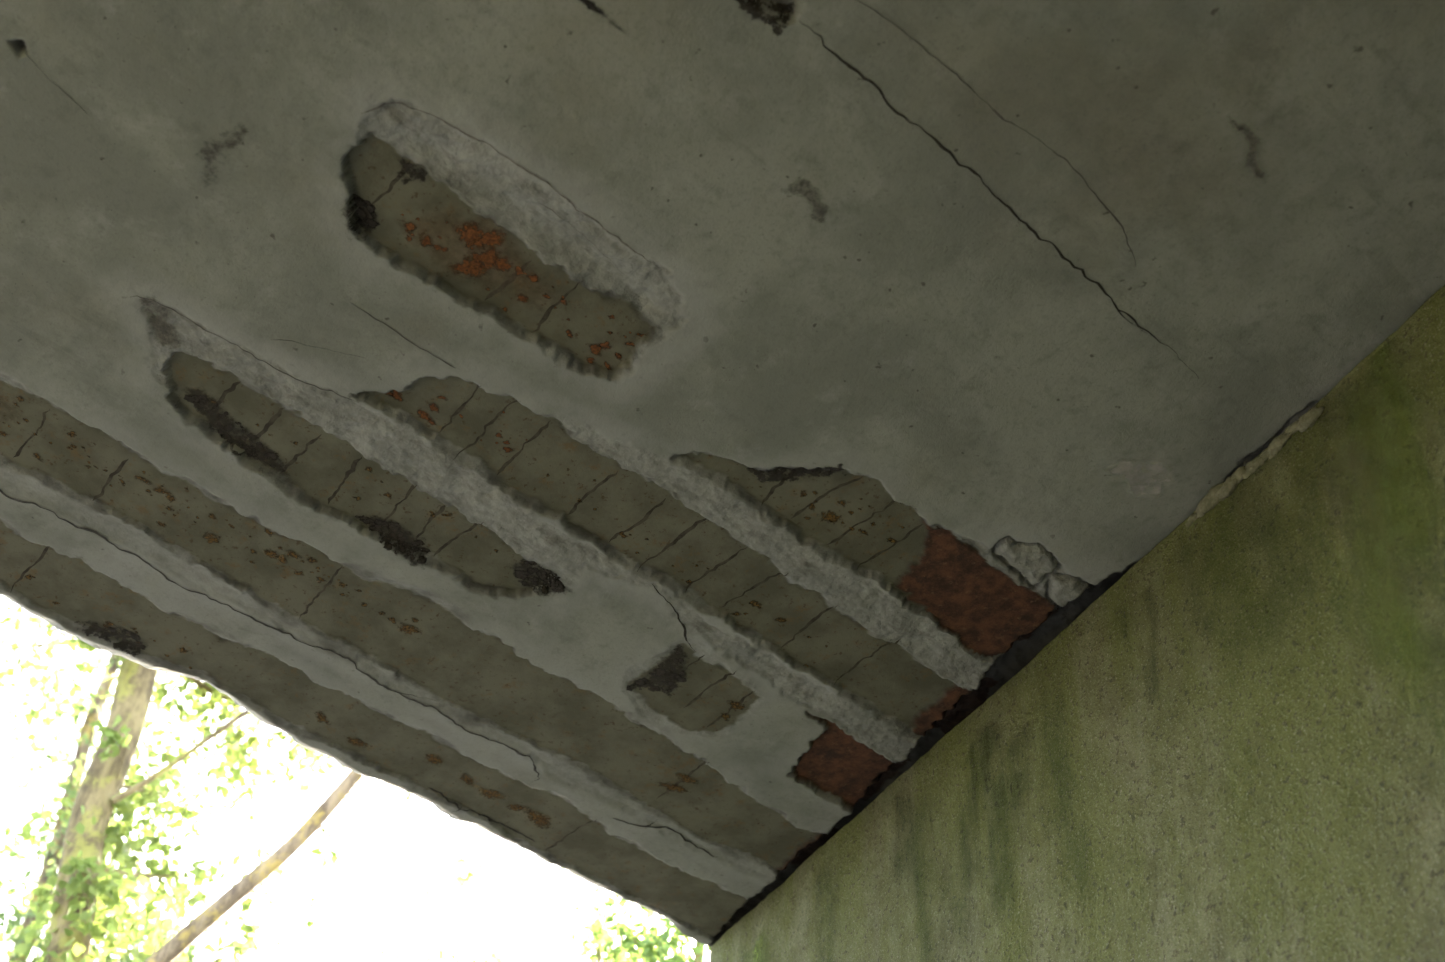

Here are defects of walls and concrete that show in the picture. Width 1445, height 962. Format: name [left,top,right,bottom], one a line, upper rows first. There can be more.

spalling [746,0,808,27]
crack [132,296,364,403]
crack [350,302,455,368]
rust [401,214,573,338]
spalling [343,97,697,386]
crack [799,0,1199,378]
spalling [1185,399,1325,527]
crack [0,489,539,781]
spalling [0,295,1103,943]
crack [428,787,535,842]
crack [614,818,715,857]